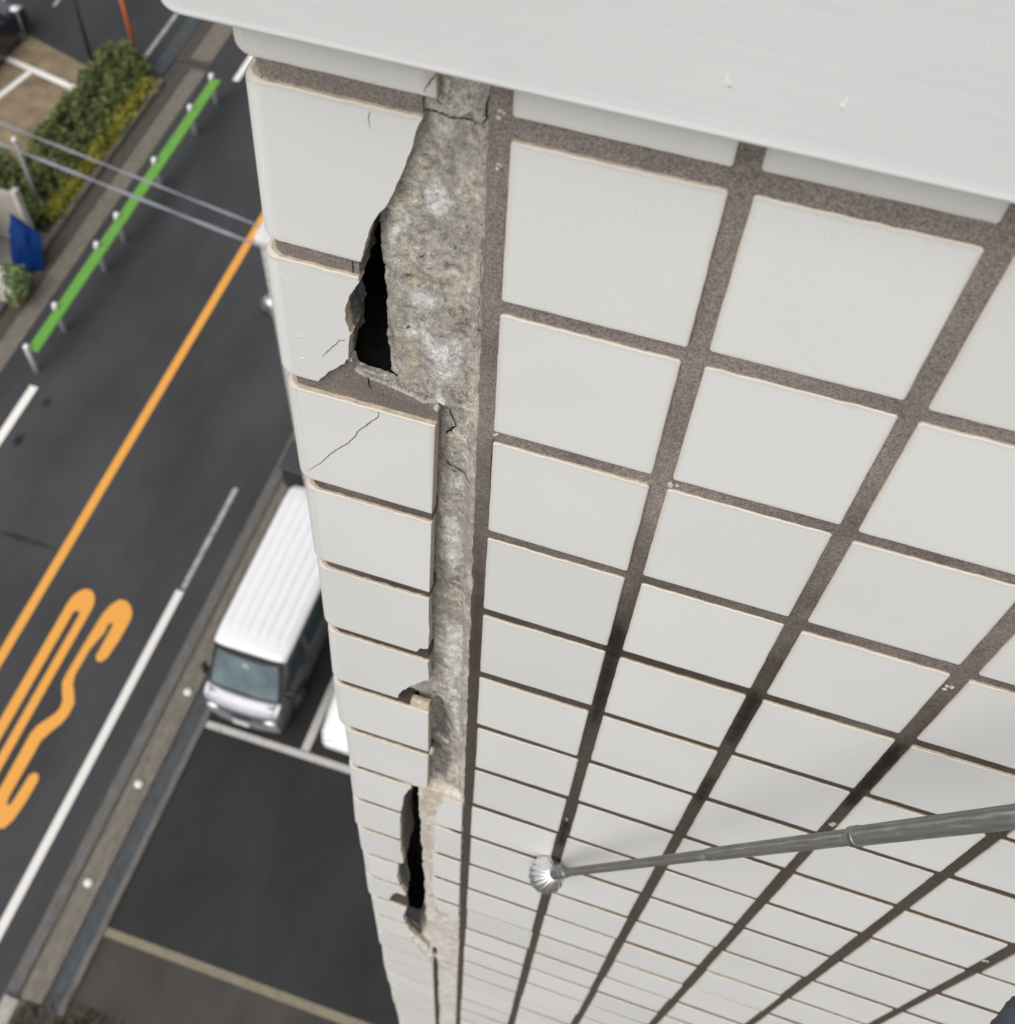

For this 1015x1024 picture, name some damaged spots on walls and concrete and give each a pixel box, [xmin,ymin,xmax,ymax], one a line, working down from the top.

crack [309,375,379,470]
spalling [296,74,490,1024]